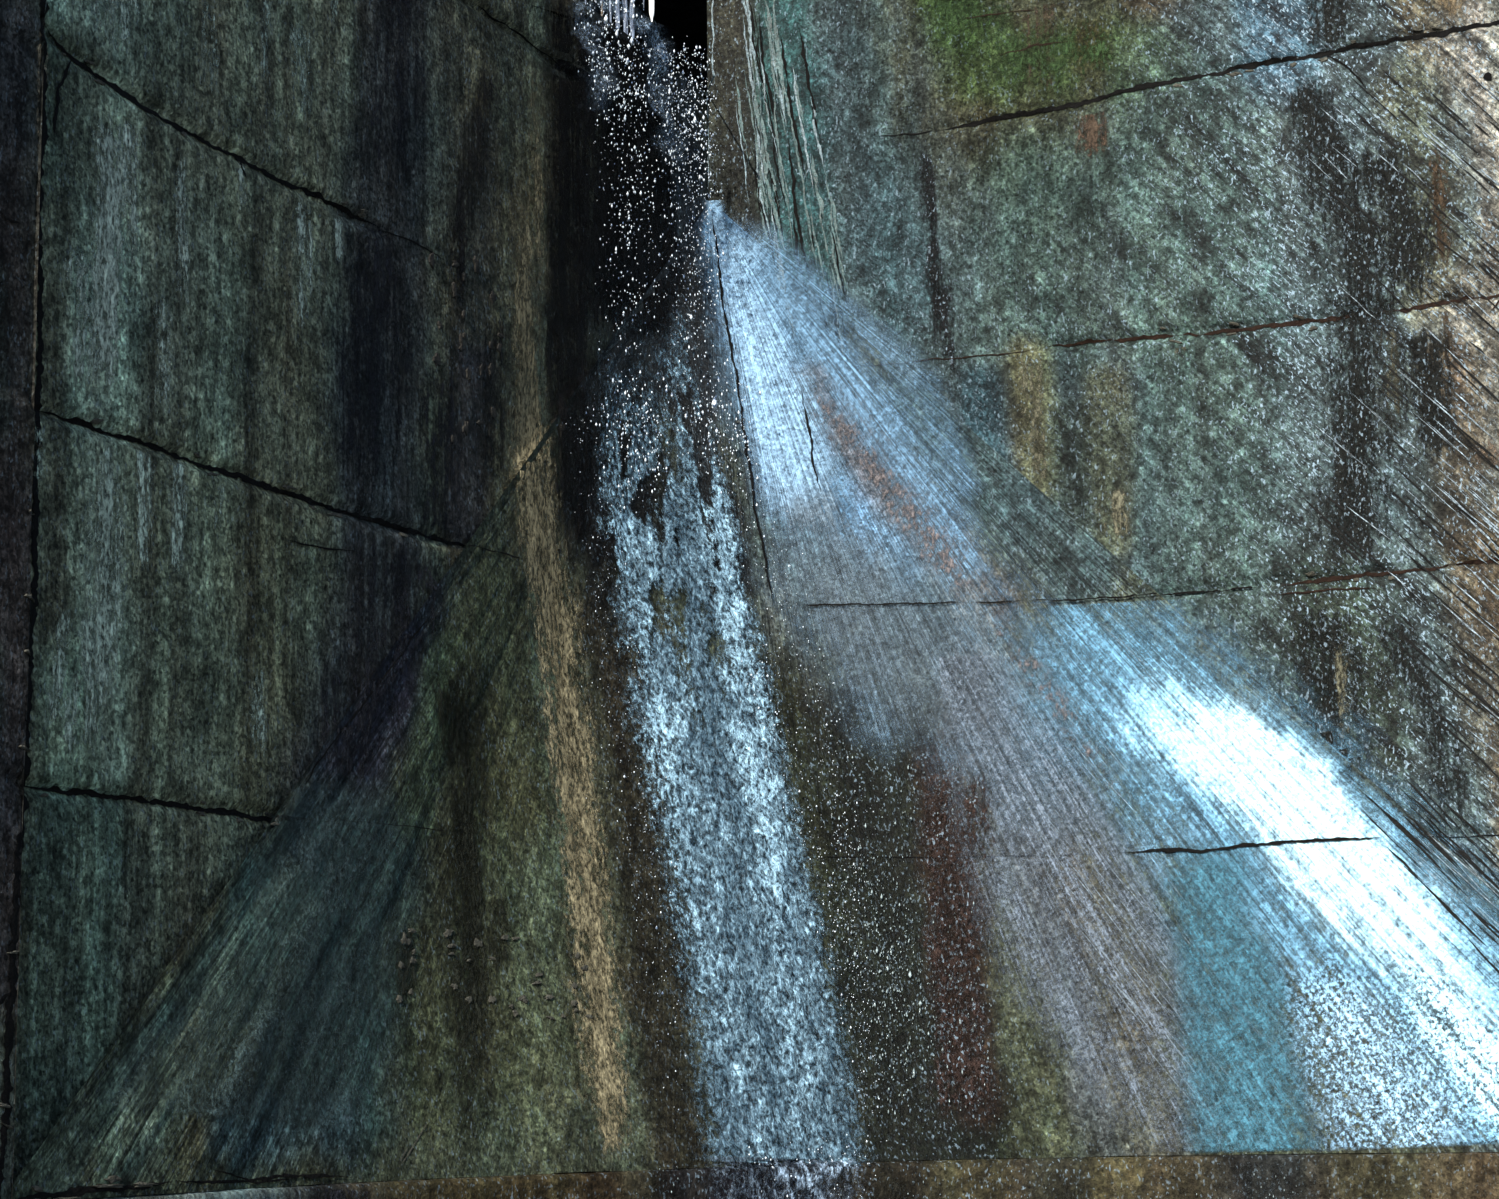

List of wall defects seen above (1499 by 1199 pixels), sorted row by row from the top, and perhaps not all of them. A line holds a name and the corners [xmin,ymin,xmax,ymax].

crack [874,20,1499,137]
crack [712,213,1499,611]
damp [965,700,1227,1109]
crack [800,834,1499,858]
damp [1402,836,1499,964]
crack [1460,1137,1499,1145]